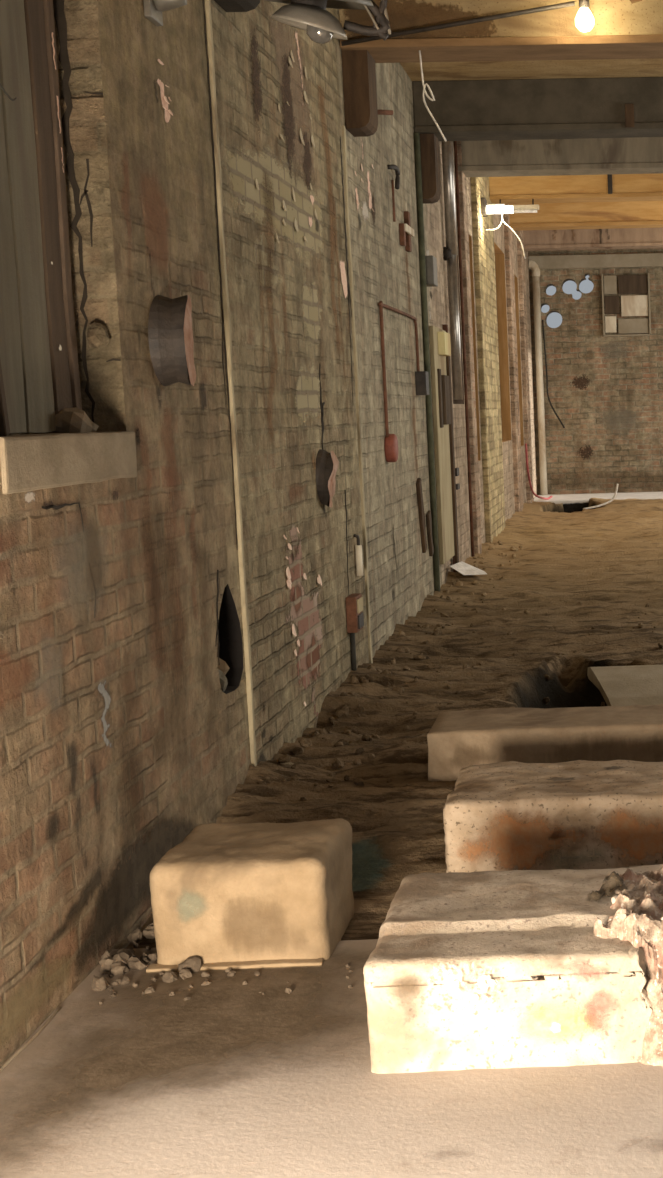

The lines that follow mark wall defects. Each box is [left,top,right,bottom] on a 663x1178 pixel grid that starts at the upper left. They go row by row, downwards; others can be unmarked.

peeling [154,78,173,123]
crack [53,0,121,422]
peeling [284,524,323,719]
water stain [48,820,192,972]